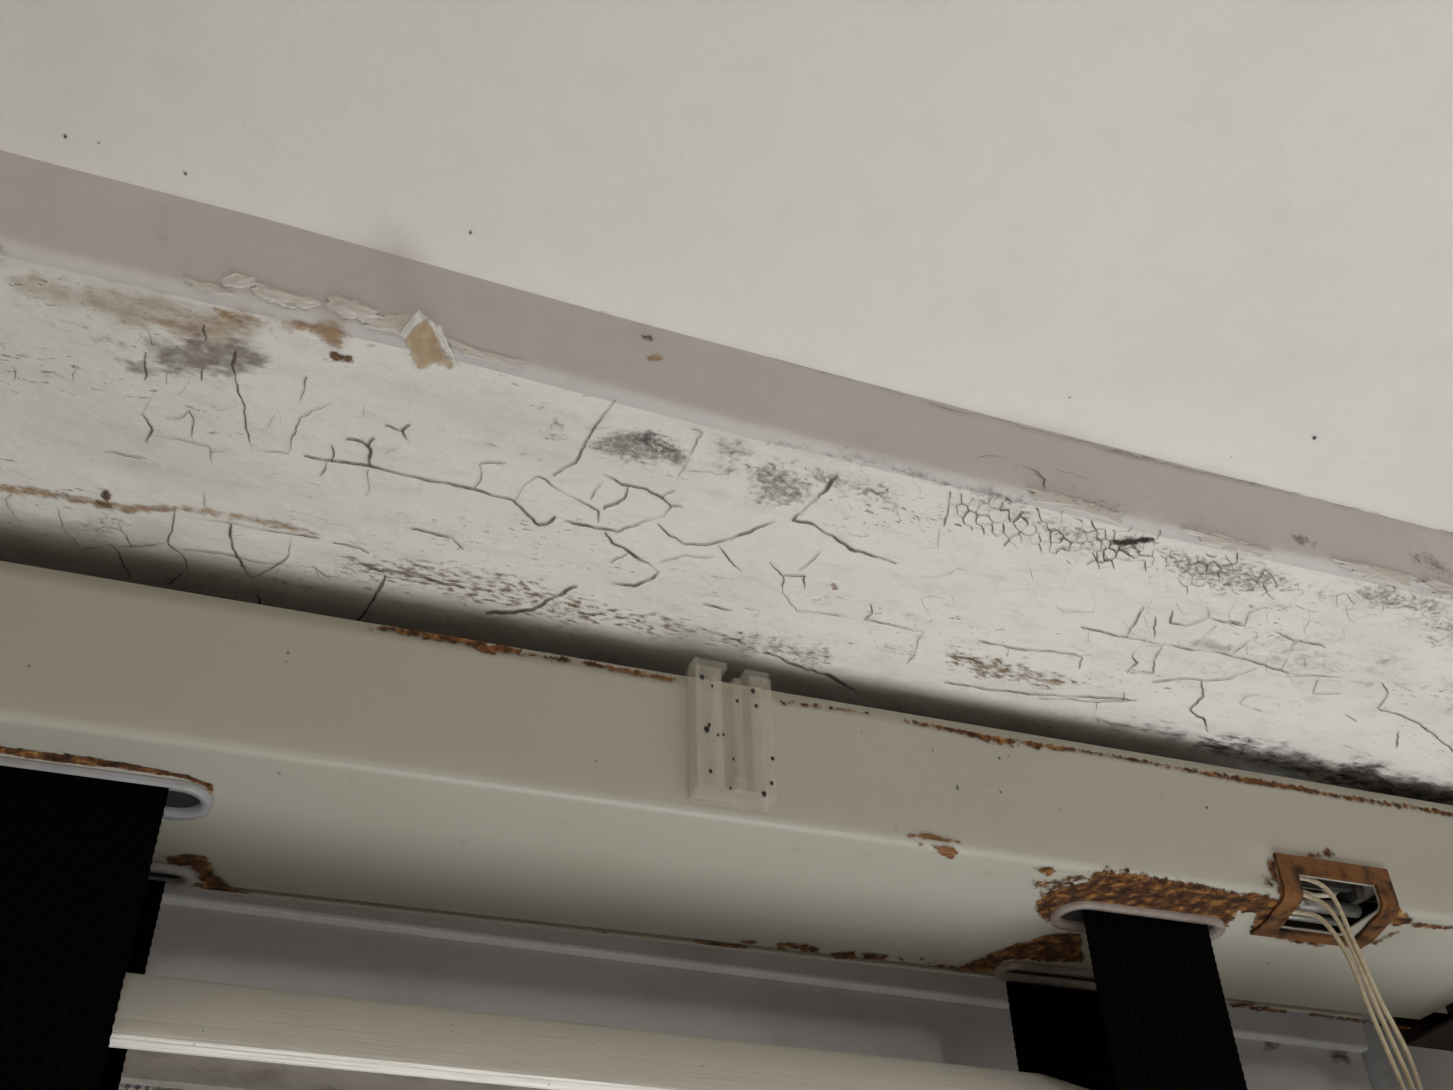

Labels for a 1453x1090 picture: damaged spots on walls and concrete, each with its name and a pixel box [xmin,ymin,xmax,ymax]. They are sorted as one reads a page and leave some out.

peeling [184,273,528,369]
damp [593,433,686,463]
damp [757,468,838,505]
crack [59,325,1453,752]
damp [1113,537,1155,553]
rust [369,625,676,681]
rust [0,747,214,794]
rust [904,719,1453,816]
damp [1206,741,1453,803]
rust [907,833,961,860]
rust [165,855,248,896]
rust [777,861,1283,972]